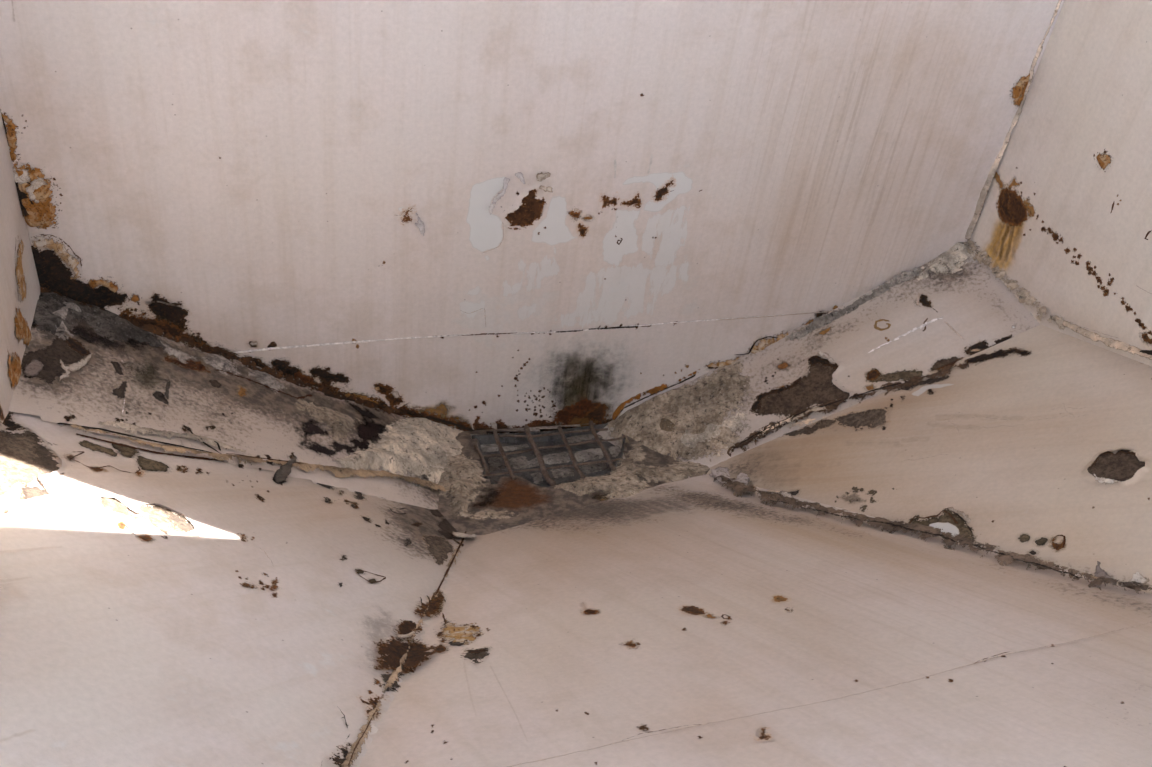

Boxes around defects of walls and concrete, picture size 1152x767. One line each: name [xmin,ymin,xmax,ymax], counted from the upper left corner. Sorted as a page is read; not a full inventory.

rust [1010,75,1033,106]
rust [1093,149,1112,172]
leakage [916,238,1065,330]
rust [979,167,1152,344]
crack [555,325,650,333]
peeling [748,350,961,436]
leakage [295,324,1026,530]
peeling [0,411,169,515]
spalling [1079,446,1152,488]
peeling [89,494,203,541]
crack [435,531,467,595]
crack [321,709,377,766]